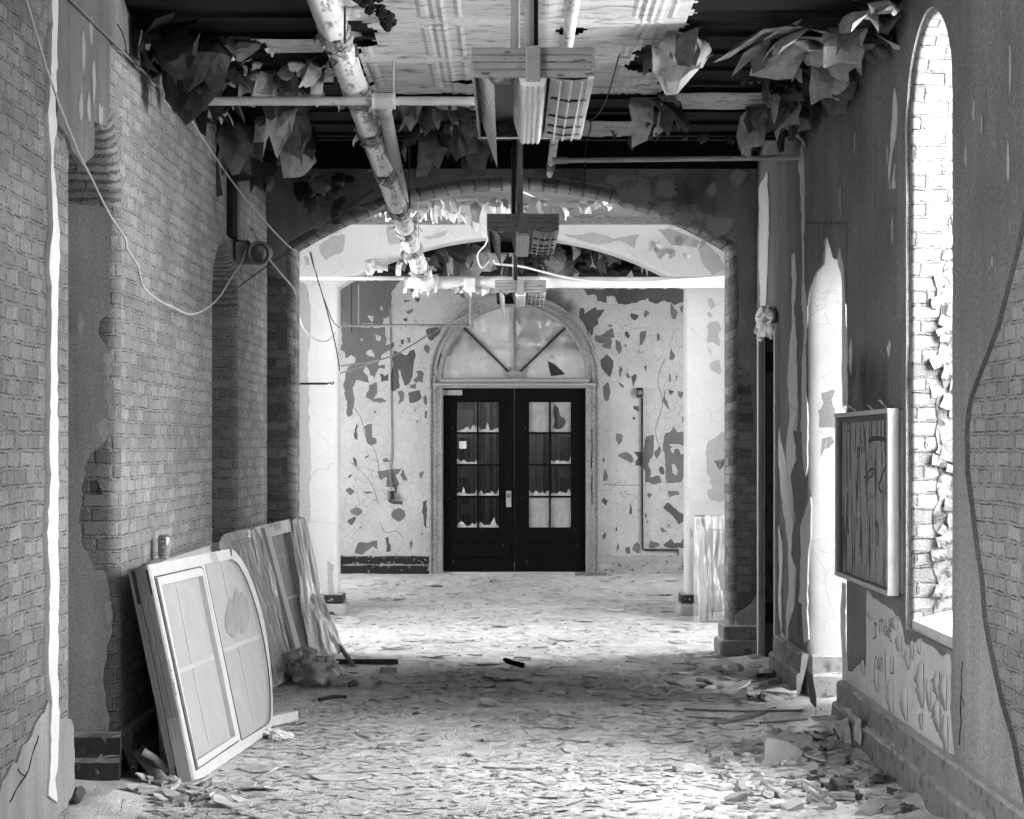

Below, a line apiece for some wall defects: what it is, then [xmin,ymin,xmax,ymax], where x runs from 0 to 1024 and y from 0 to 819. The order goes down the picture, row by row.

spalling [68,203,115,732]
peeling [348,507,362,529]
peeling [355,537,391,555]
peeling [378,458,425,522]
peeling [409,500,427,551]
peeling [340,197,684,495]
spalling [610,0,904,644]
spalling [929,248,953,615]
peeling [840,582,954,755]